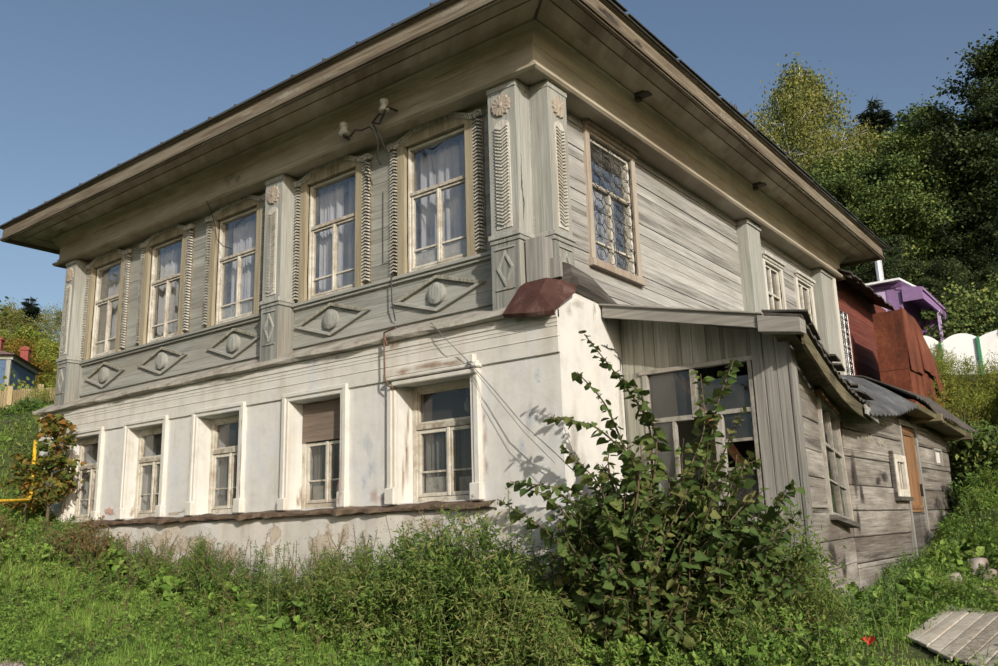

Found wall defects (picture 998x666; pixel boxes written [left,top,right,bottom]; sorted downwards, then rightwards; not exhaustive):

leakage [852,454,864,531]
peeling [308,524,349,577]